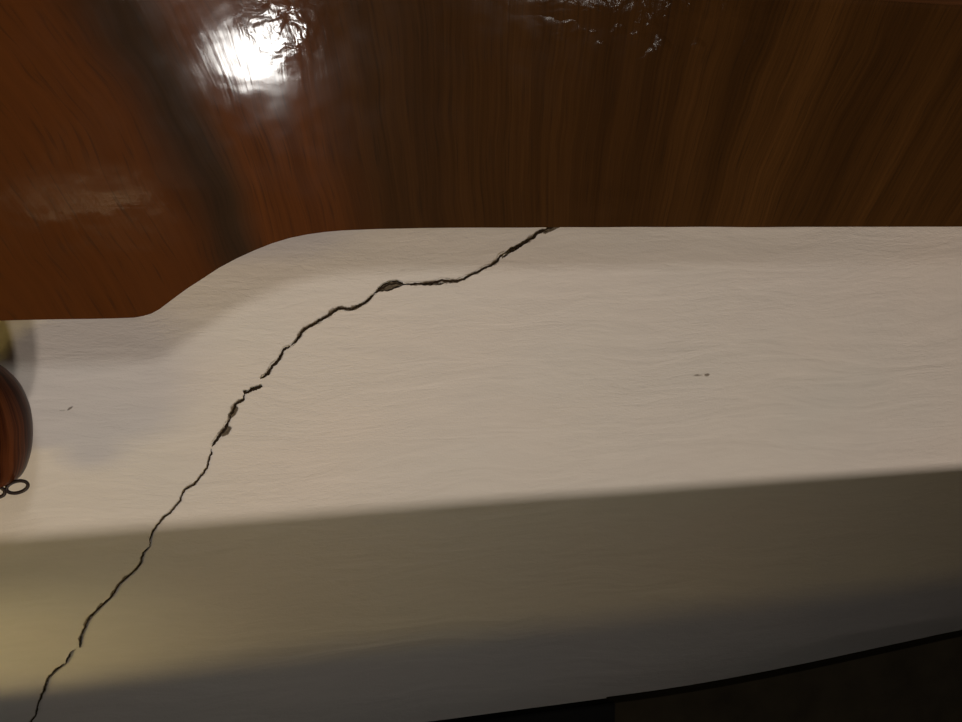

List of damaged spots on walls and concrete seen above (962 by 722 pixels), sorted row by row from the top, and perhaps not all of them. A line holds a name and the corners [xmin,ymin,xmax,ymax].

crack [30,227,560,722]